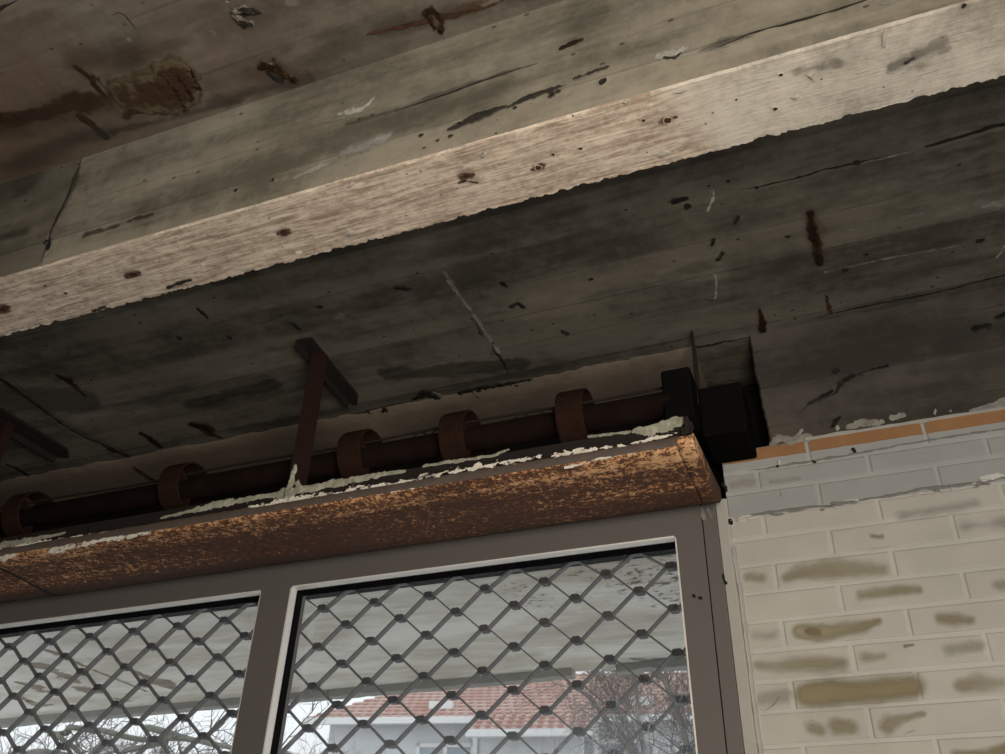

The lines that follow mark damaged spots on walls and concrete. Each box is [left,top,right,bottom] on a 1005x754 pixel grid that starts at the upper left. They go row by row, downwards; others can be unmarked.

spalling [73,55,202,119]
crack [41,144,128,261]
crack [799,364,889,414]